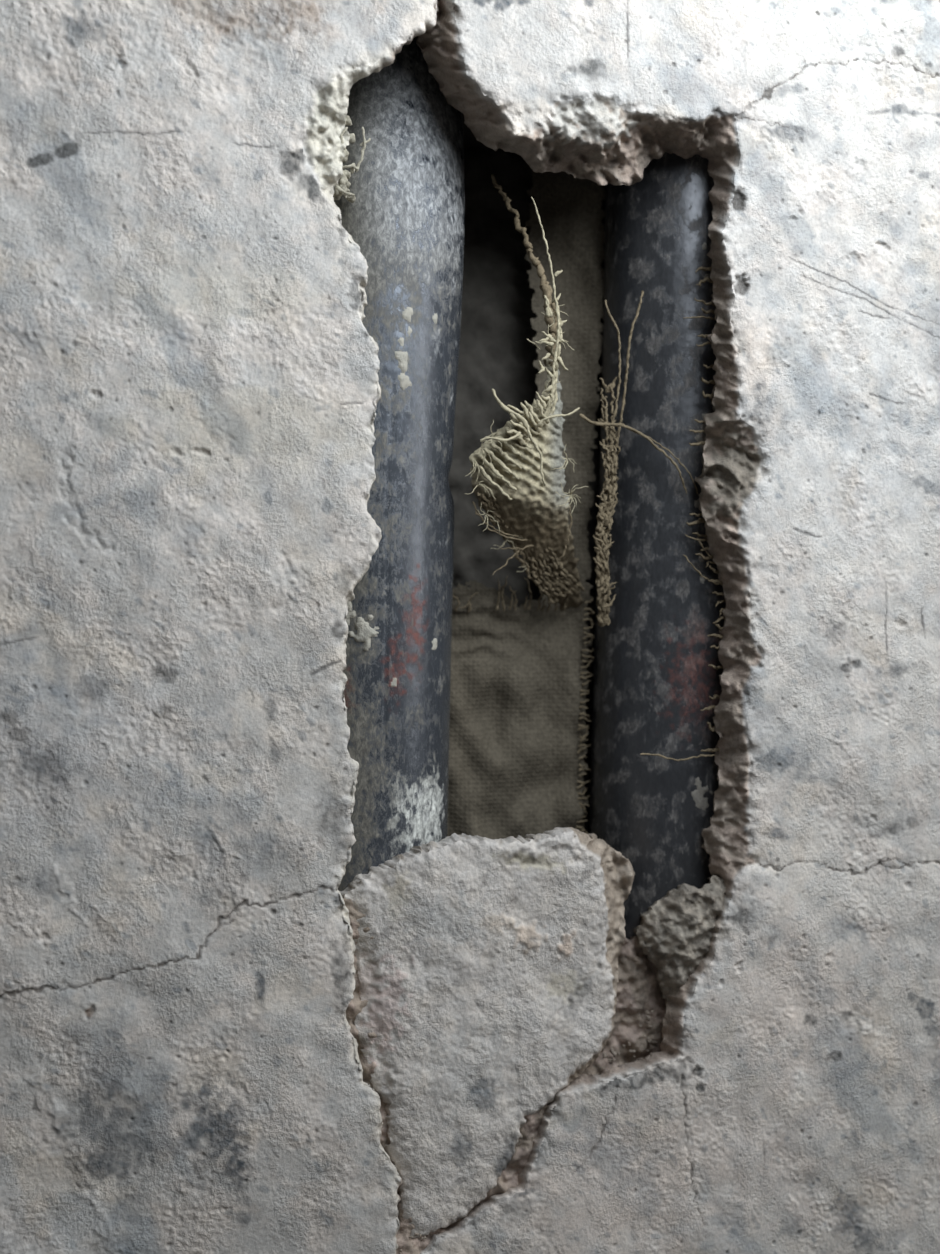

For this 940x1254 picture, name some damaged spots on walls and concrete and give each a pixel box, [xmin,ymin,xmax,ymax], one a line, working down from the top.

crack [735,64,817,127]
spalling [302,0,764,1254]
crack [760,858,940,875]
crack [93,887,332,983]
crack [0,986,49,997]